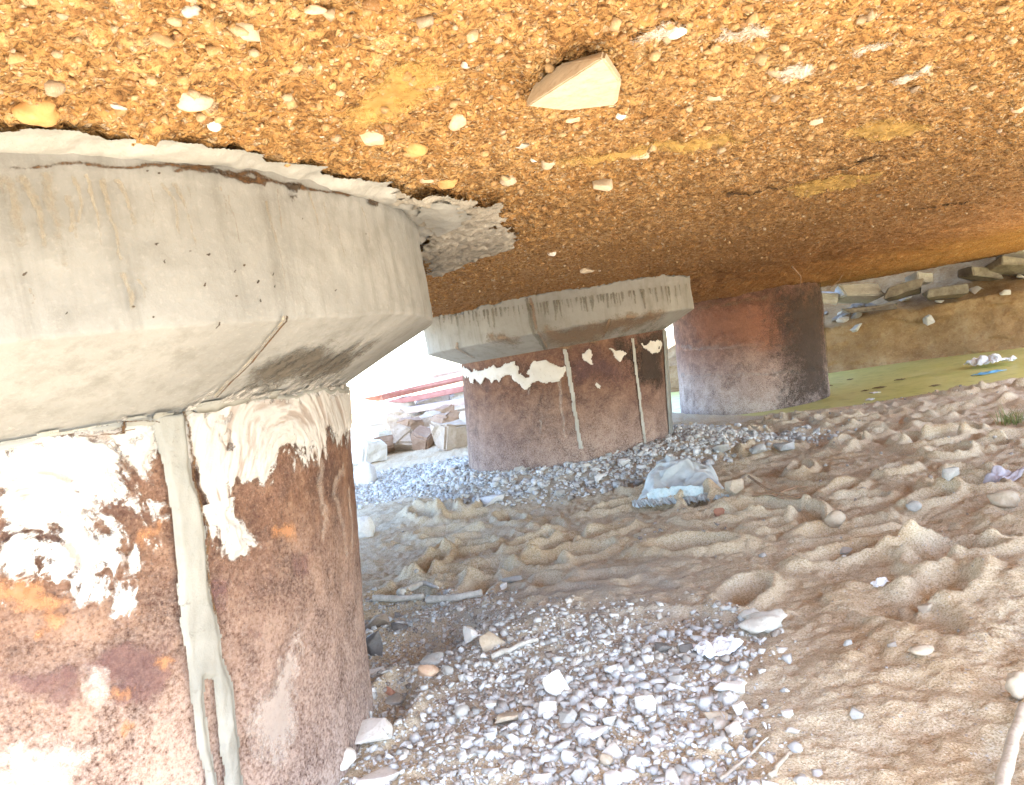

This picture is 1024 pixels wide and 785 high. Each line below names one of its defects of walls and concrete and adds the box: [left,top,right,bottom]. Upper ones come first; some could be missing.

spalling [392,192,519,278]
leakage [247,340,377,392]
flaking render [462,360,566,390]
flaking render [582,349,593,365]
flaking render [609,348,627,362]
flaking render [641,339,662,354]
flaking render [174,376,352,561]
flaking render [0,417,169,620]